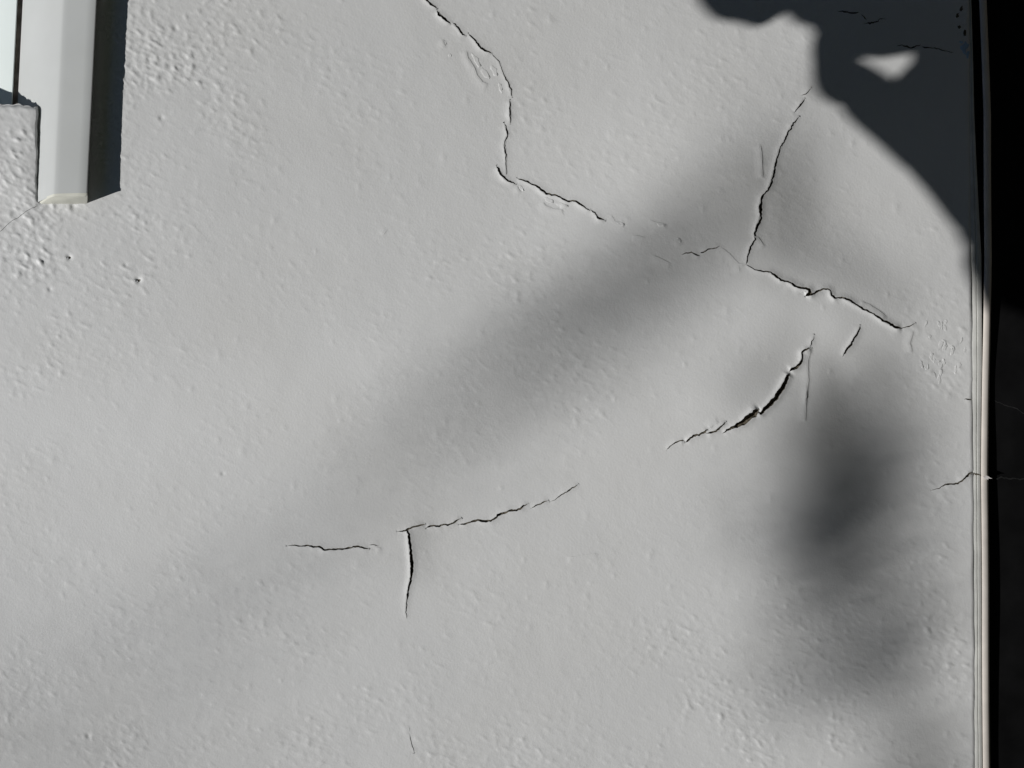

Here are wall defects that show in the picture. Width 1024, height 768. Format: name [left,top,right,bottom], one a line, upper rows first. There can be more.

crack [423,0,917,358]
crack [665,334,817,451]
crack [930,470,981,493]
crack [287,482,580,620]